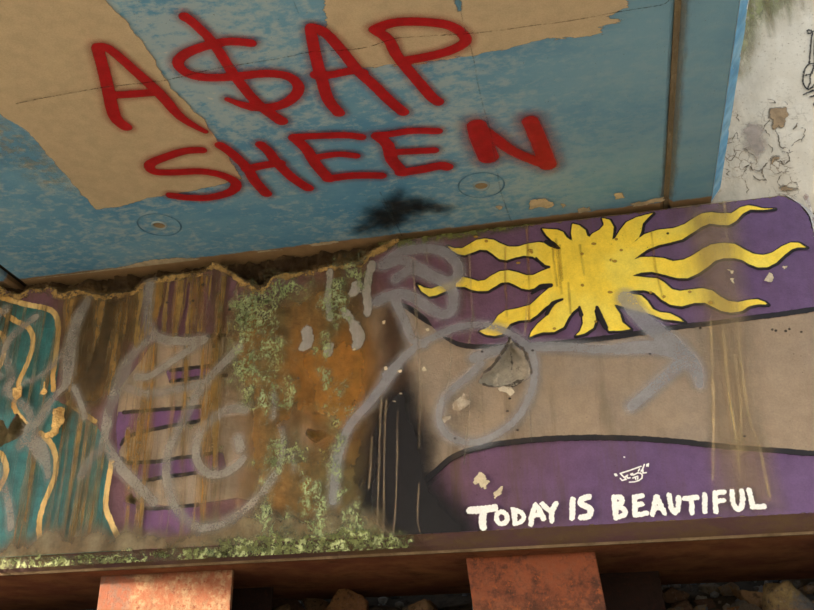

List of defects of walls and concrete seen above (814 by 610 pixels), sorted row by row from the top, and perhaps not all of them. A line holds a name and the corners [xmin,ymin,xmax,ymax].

crack [725,99,806,191]
peeling [614,193,665,208]
spalling [0,235,399,301]
spalling [479,336,534,399]
corrosion [116,273,375,538]